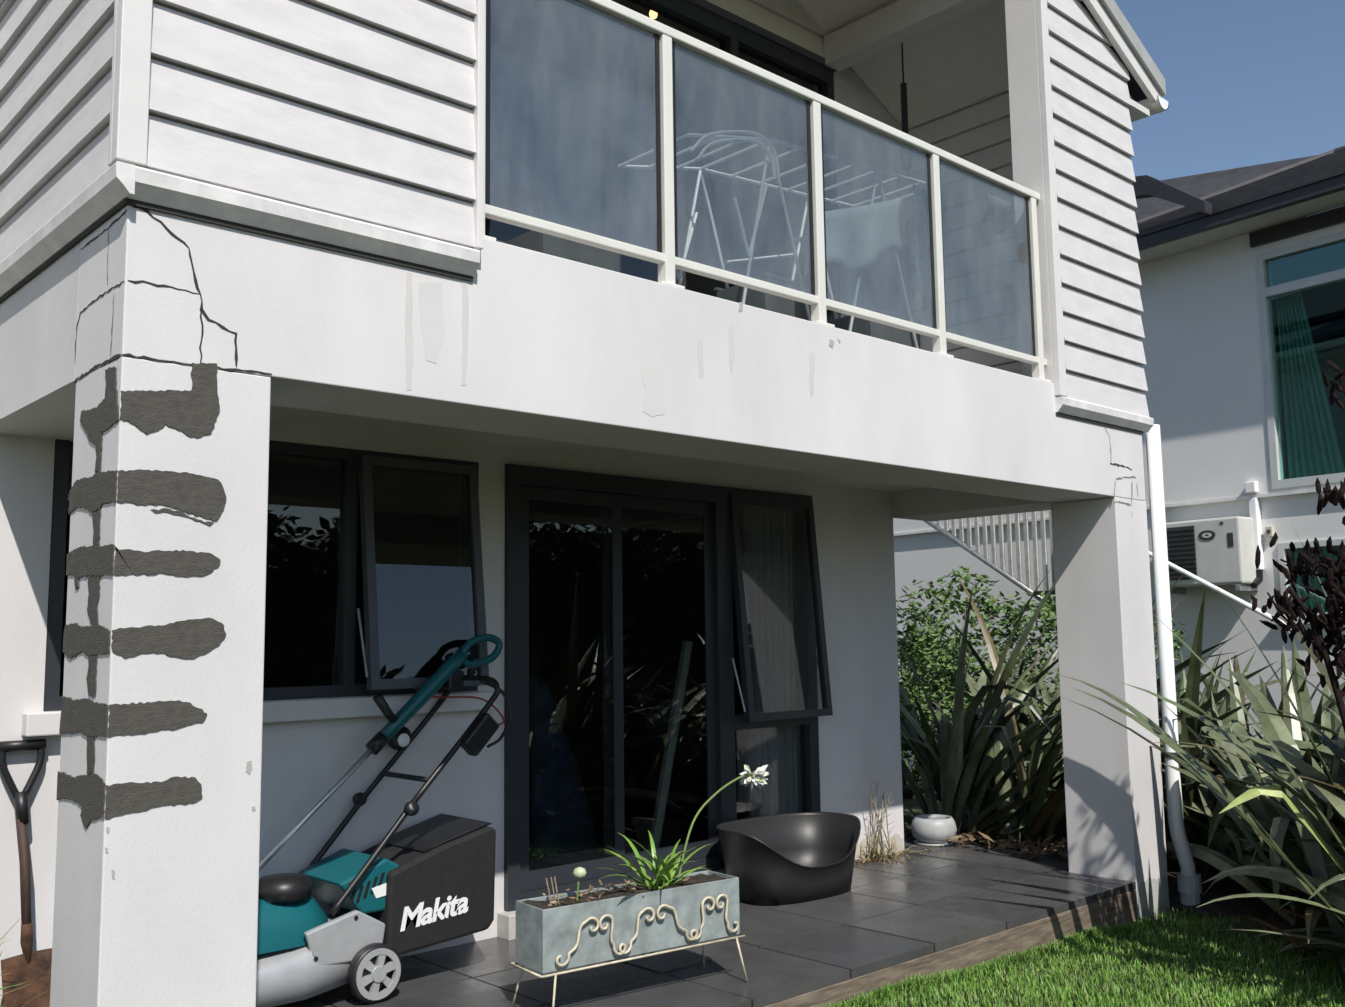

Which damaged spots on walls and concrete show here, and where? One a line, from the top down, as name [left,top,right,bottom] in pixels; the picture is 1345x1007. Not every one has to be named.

crack [74,206,272,383]
crack [1105,428,1138,513]